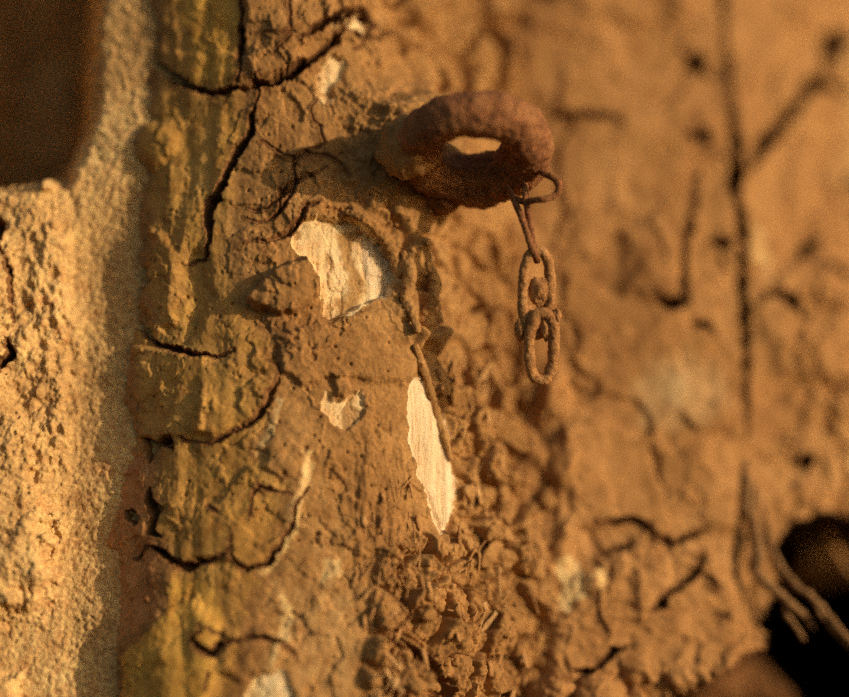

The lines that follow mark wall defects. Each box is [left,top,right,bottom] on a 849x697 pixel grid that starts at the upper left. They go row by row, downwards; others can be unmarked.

crack [148,0,393,267]
crack [651,0,849,439]
crack [0,215,17,375]
crack [136,321,237,360]
peeling [290,209,442,333]
corrosion [514,318,524,342]
corrosion [528,276,562,342]
crack [178,358,282,447]
peeling [320,389,366,432]
peeling [413,344,454,461]
crack [783,435,817,473]
crack [133,481,310,574]